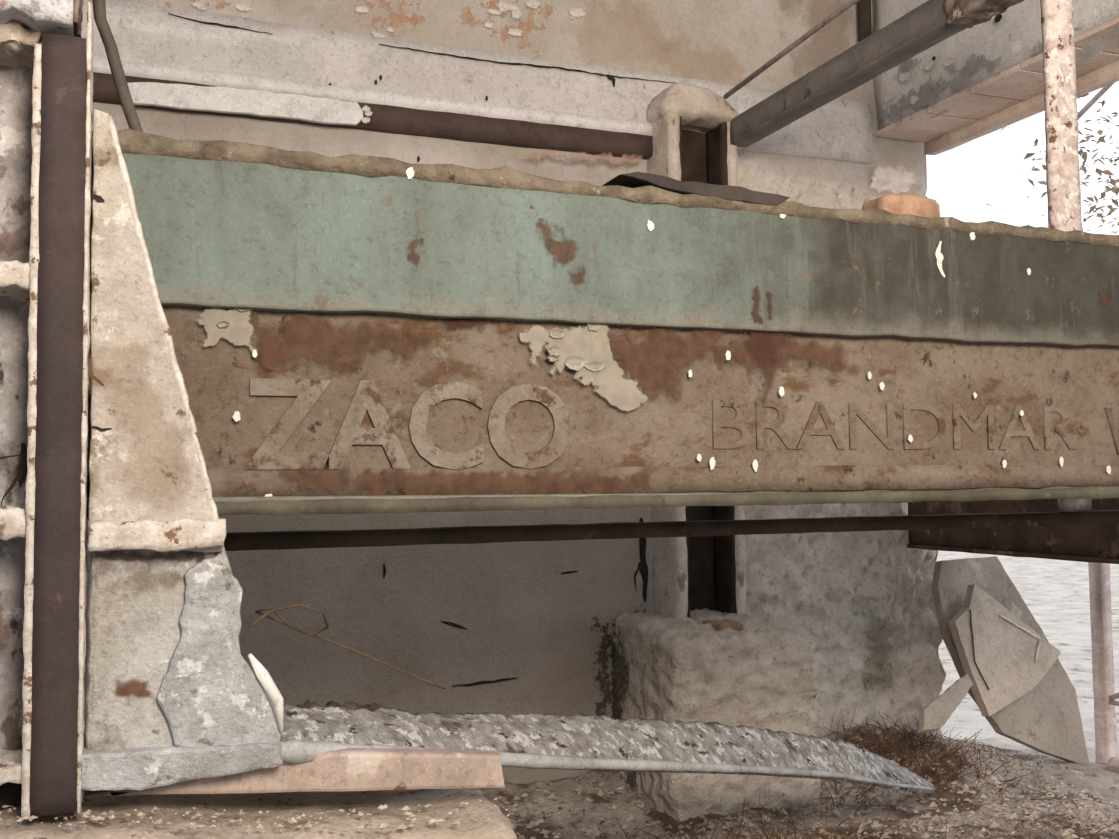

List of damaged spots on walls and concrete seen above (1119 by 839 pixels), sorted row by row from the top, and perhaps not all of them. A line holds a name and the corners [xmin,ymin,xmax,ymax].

peeling [943,0,1024,28]
peeling [127,82,373,126]
peeling [883,53,1002,125]
corrosion [407,239,423,264]
corrosion [537,219,585,284]
peeling [198,308,256,352]
peeling [520,324,648,411]
corrosion [609,287,855,399]
spalling [76,2,219,813]
corrosion [117,680,151,697]